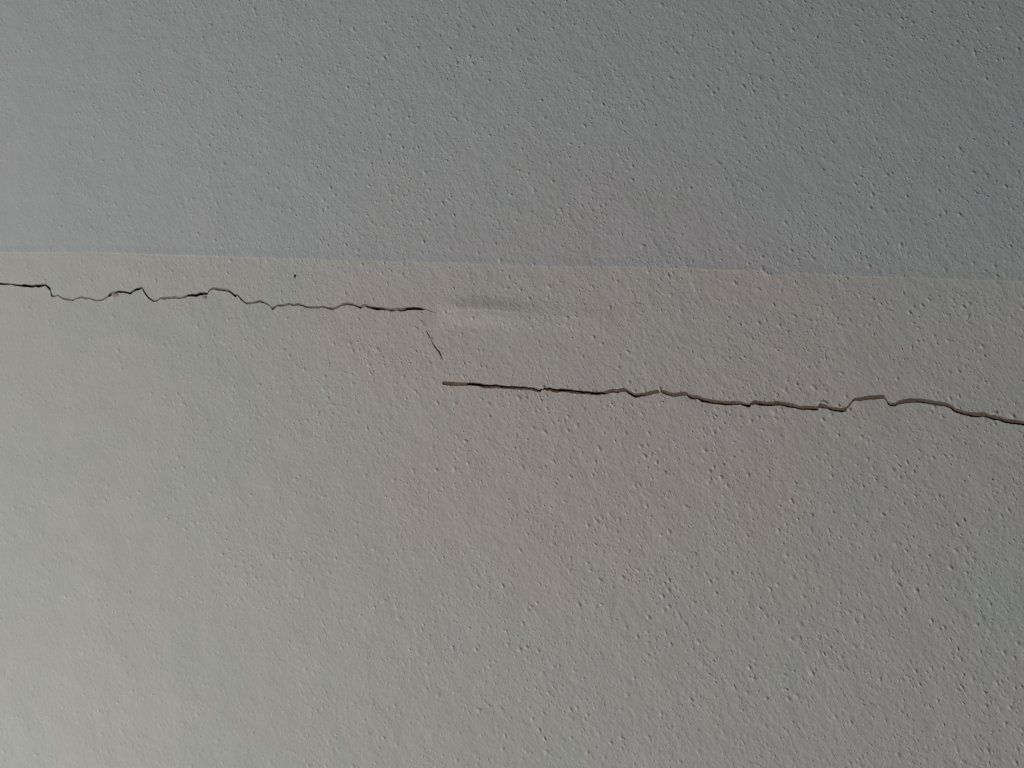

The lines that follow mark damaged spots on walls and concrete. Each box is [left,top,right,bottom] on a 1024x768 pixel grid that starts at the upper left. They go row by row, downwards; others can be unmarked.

crack [0,283,1024,426]